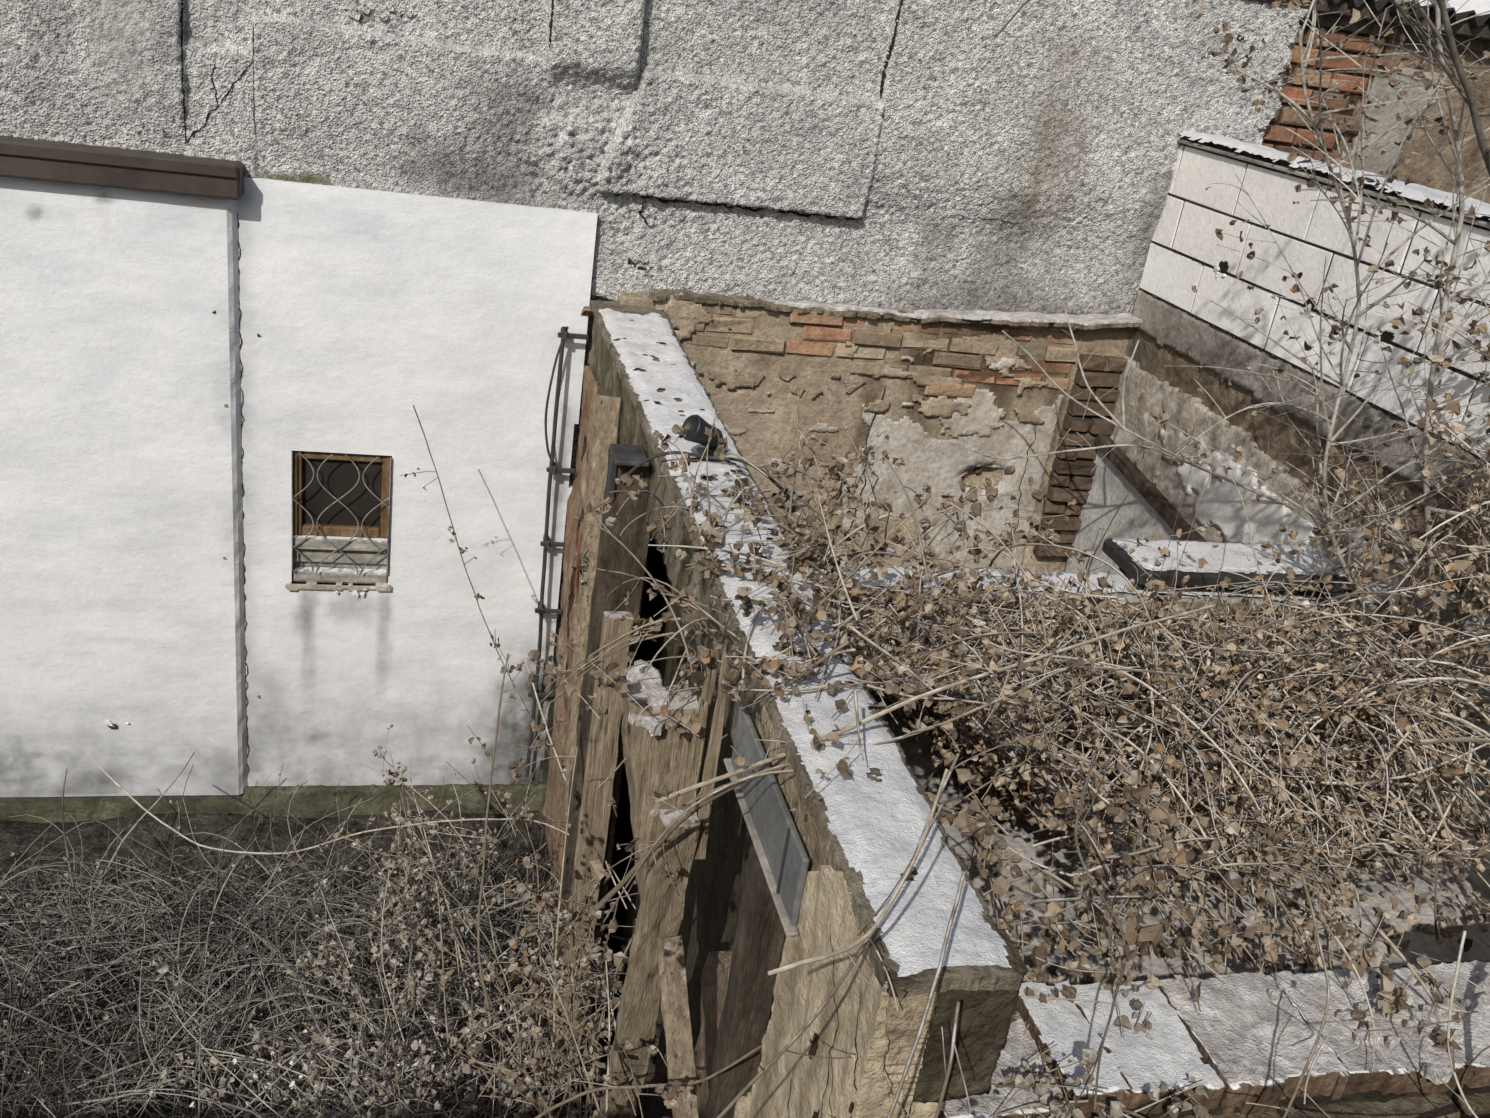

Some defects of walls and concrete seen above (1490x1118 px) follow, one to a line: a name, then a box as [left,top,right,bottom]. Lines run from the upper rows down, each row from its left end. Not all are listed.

crack [180,0,256,144]
crack [879,0,903,99]
spalling [1256,8,1395,169]
crack [608,189,862,228]
spalling [655,292,1084,573]
spalling [1128,330,1490,610]
spalling [869,691,908,717]
spalling [819,590,1418,696]
crack [788,925,860,1118]